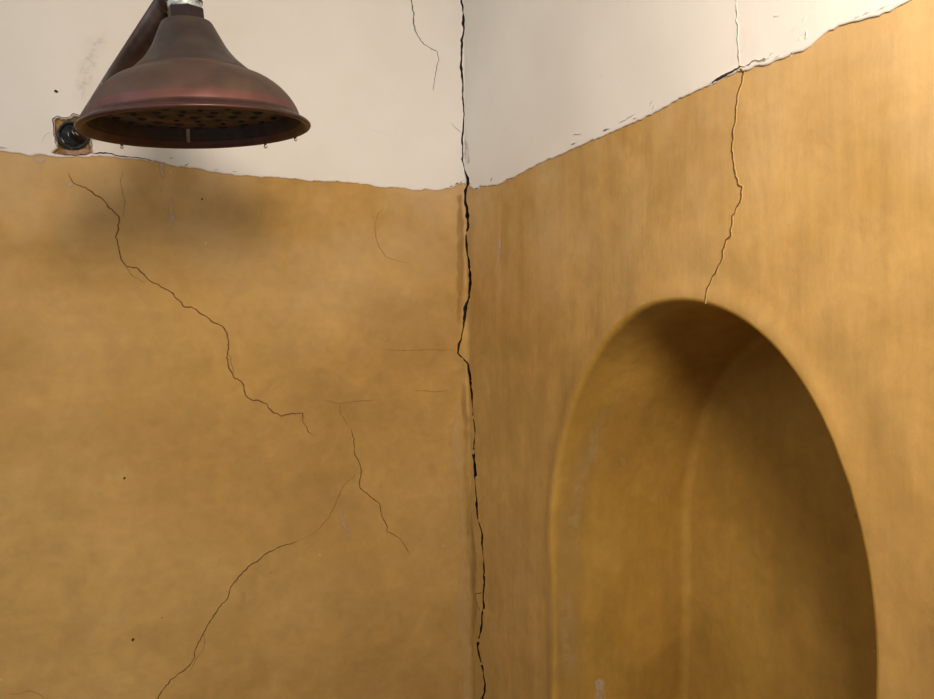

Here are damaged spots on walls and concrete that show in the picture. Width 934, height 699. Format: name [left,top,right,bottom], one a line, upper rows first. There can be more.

crack [68,152,314,435]
crack [380,0,486,699]
crack [705,0,768,304]
crack [156,399,409,699]